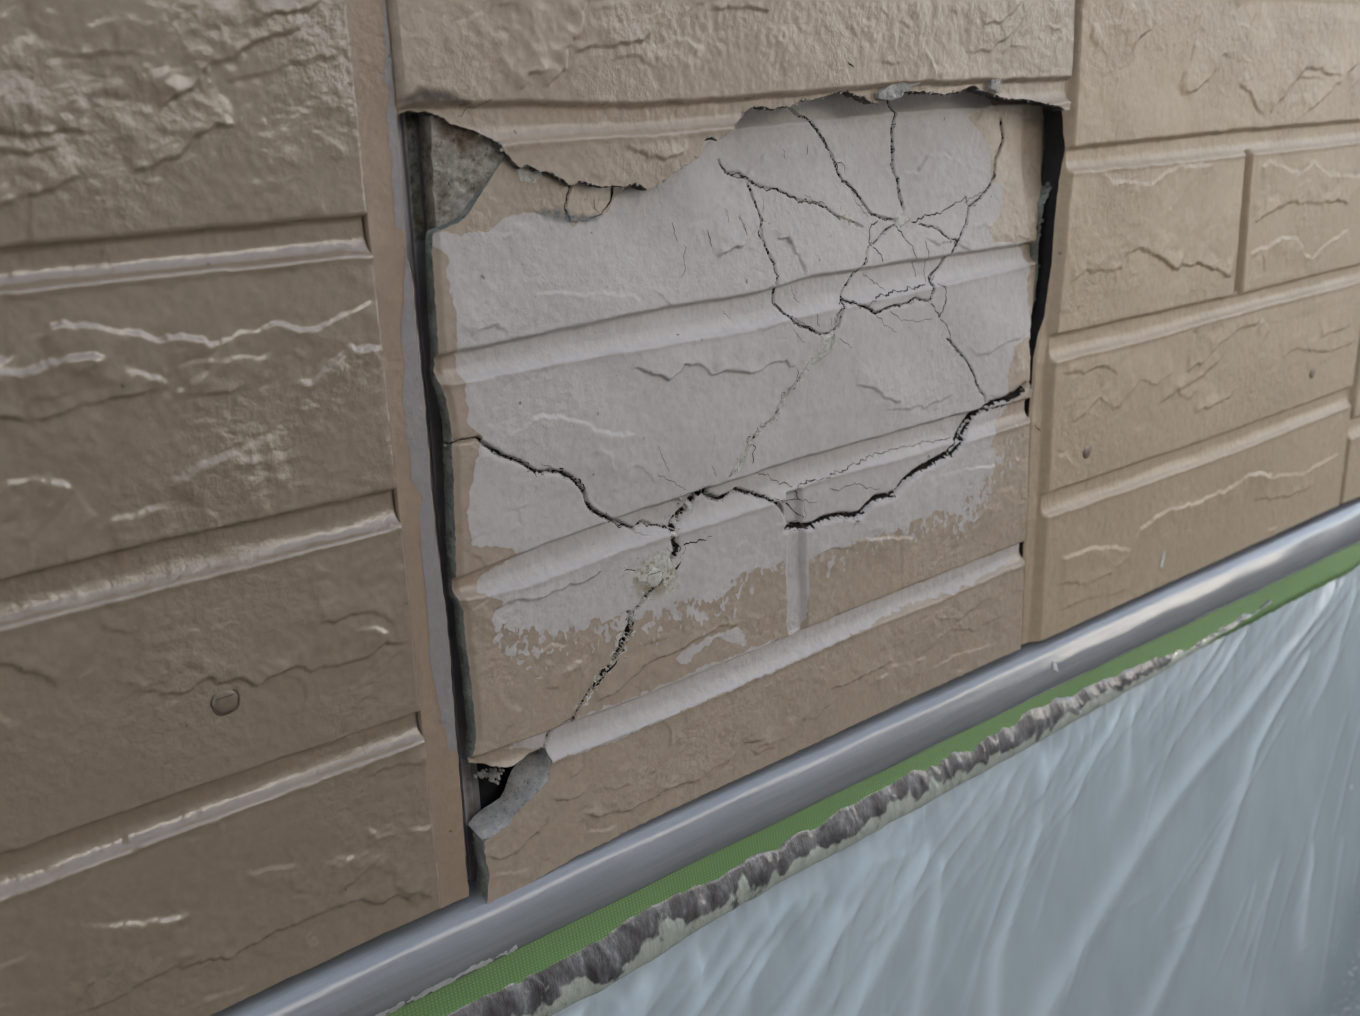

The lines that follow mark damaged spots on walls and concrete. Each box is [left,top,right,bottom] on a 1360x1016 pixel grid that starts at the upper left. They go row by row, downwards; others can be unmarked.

peeling [418,82,1031,840]
crack [437,100,1025,750]